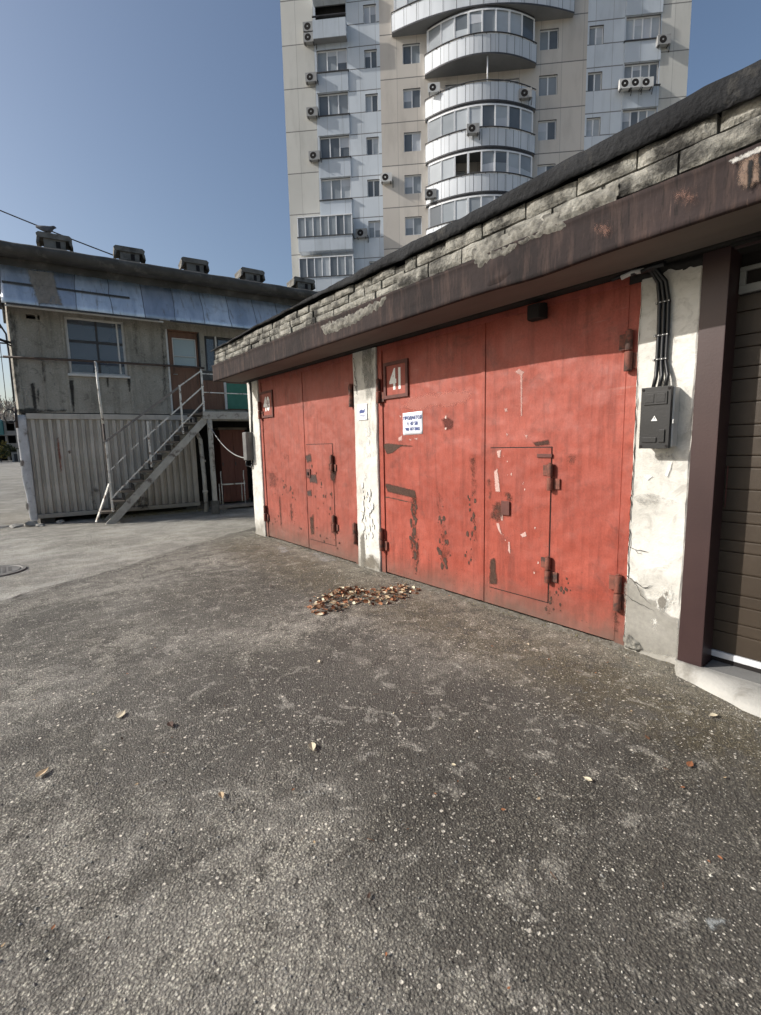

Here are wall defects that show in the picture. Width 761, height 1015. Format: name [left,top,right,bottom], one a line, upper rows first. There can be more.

peeling [494,450,508,492]
peeling [360,483,375,567]
rust [385,484,419,570]
peeling [656,588,673,609]
spalling [623,634,643,652]